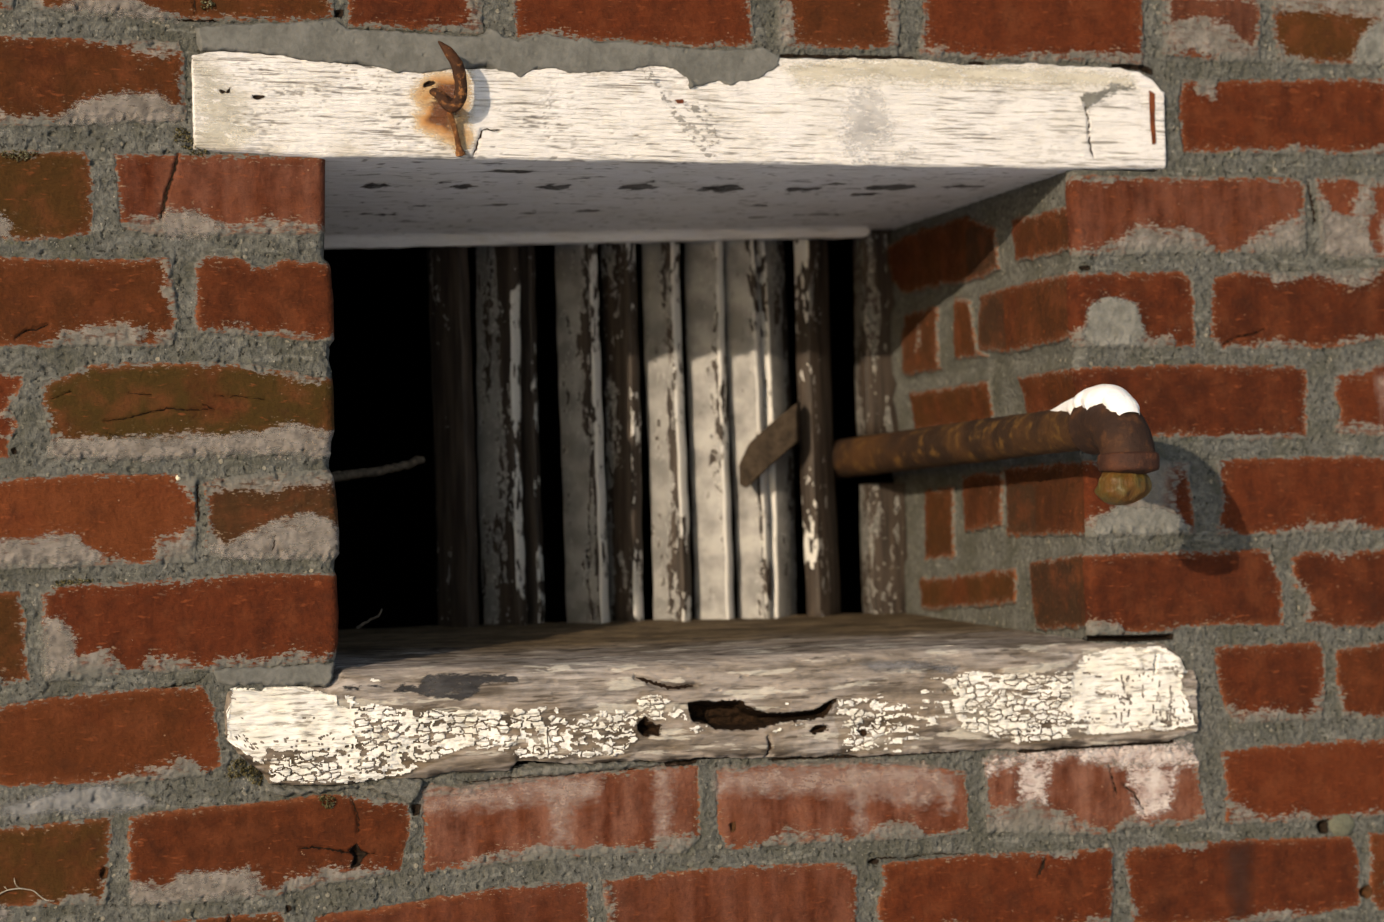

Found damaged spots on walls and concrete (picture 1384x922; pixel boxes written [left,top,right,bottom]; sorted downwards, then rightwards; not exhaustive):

corrosion [411,72,474,150]
crack [160,154,179,219]
efflorescence [1319,213,1378,260]
peeling [226,685,707,784]
peeling [836,646,1197,753]
crack [301,798,375,854]